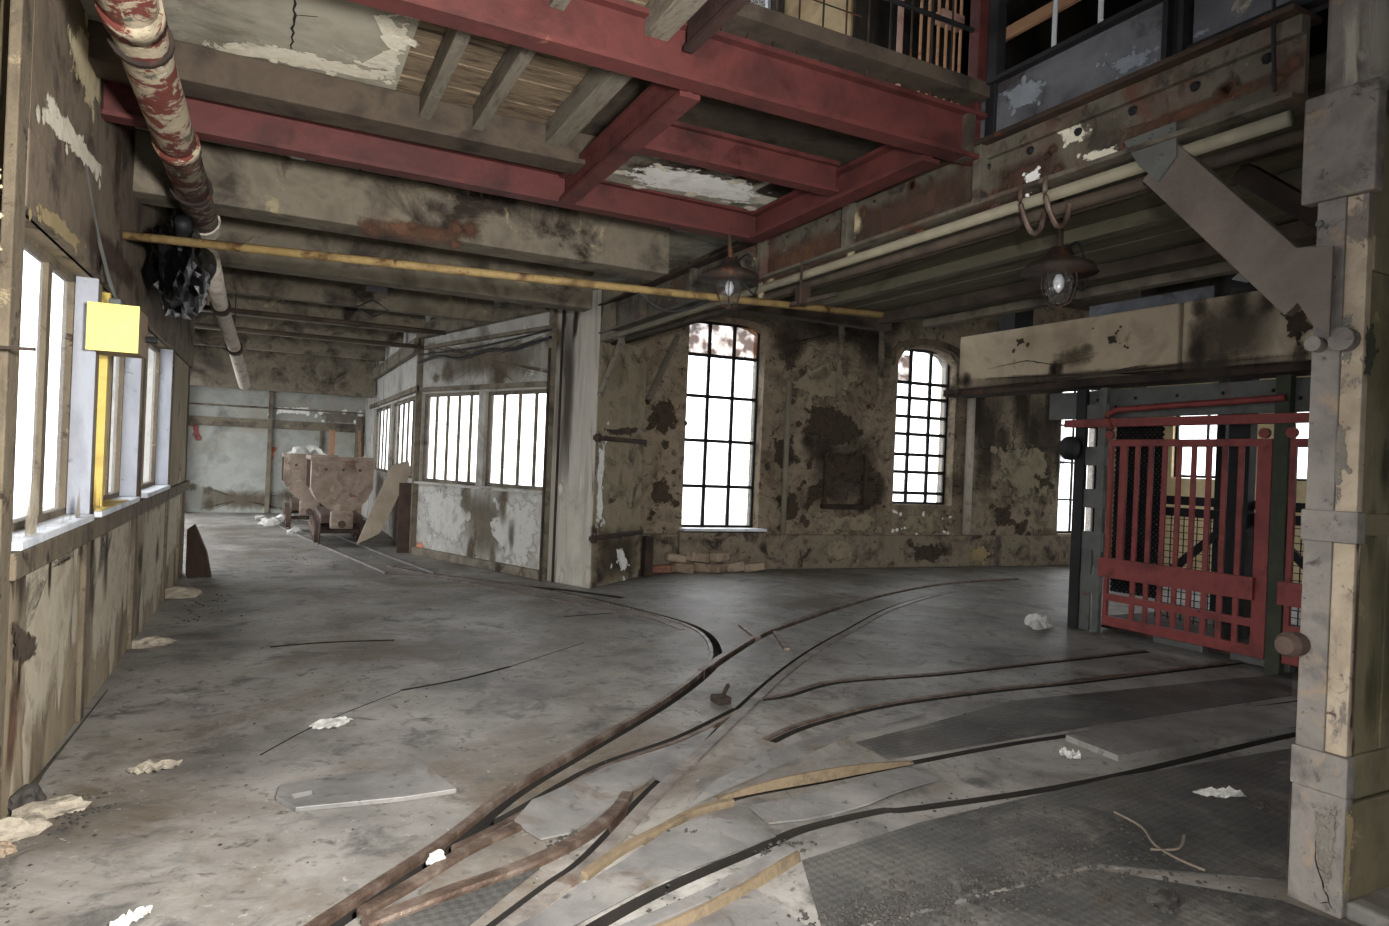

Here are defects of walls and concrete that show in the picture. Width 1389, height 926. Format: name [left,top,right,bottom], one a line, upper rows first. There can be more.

crack [290,0,318,50]
peeling [202,14,420,85]
peeling [36,10,103,190]
rust [100,78,132,187]
peeling [1057,124,1117,161]
peeling [613,163,770,211]
peeling [1022,166,1041,197]
rust [360,220,477,249]
leakage [947,374,984,435]
leakage [462,484,513,561]
peeling [490,494,541,566]
peeling [558,397,688,586]